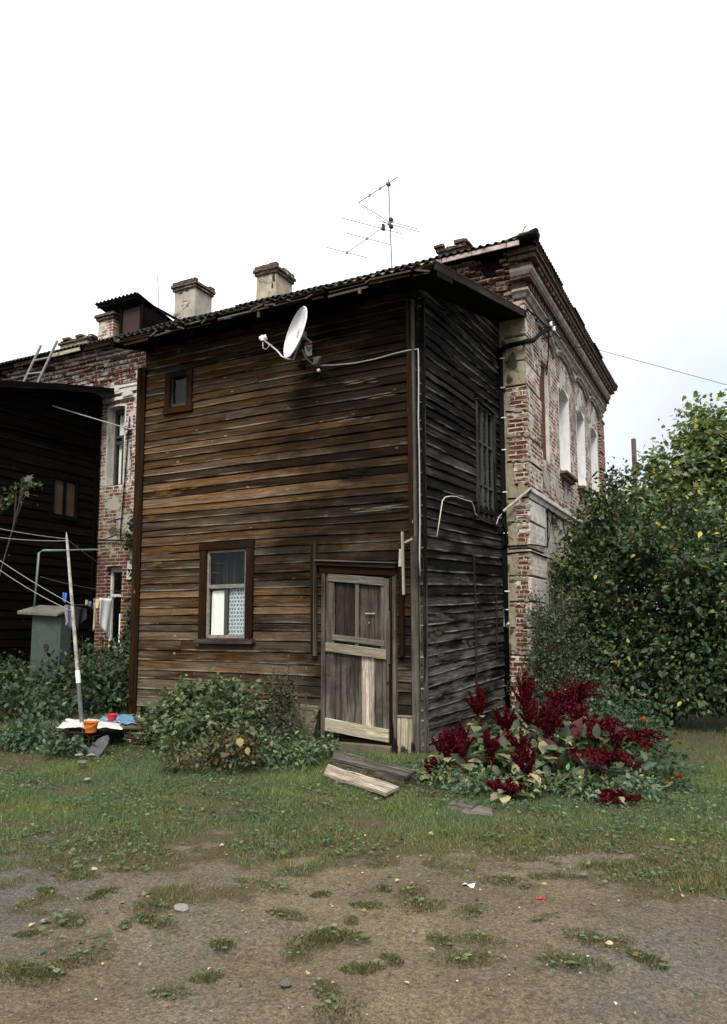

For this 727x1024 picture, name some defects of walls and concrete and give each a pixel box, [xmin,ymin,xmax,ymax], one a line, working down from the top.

water stain [297,360,395,399]
peeling [123,410,133,470]
spalling [507,392,531,486]
flaking render [104,495,130,543]
spalling [509,502,533,705]